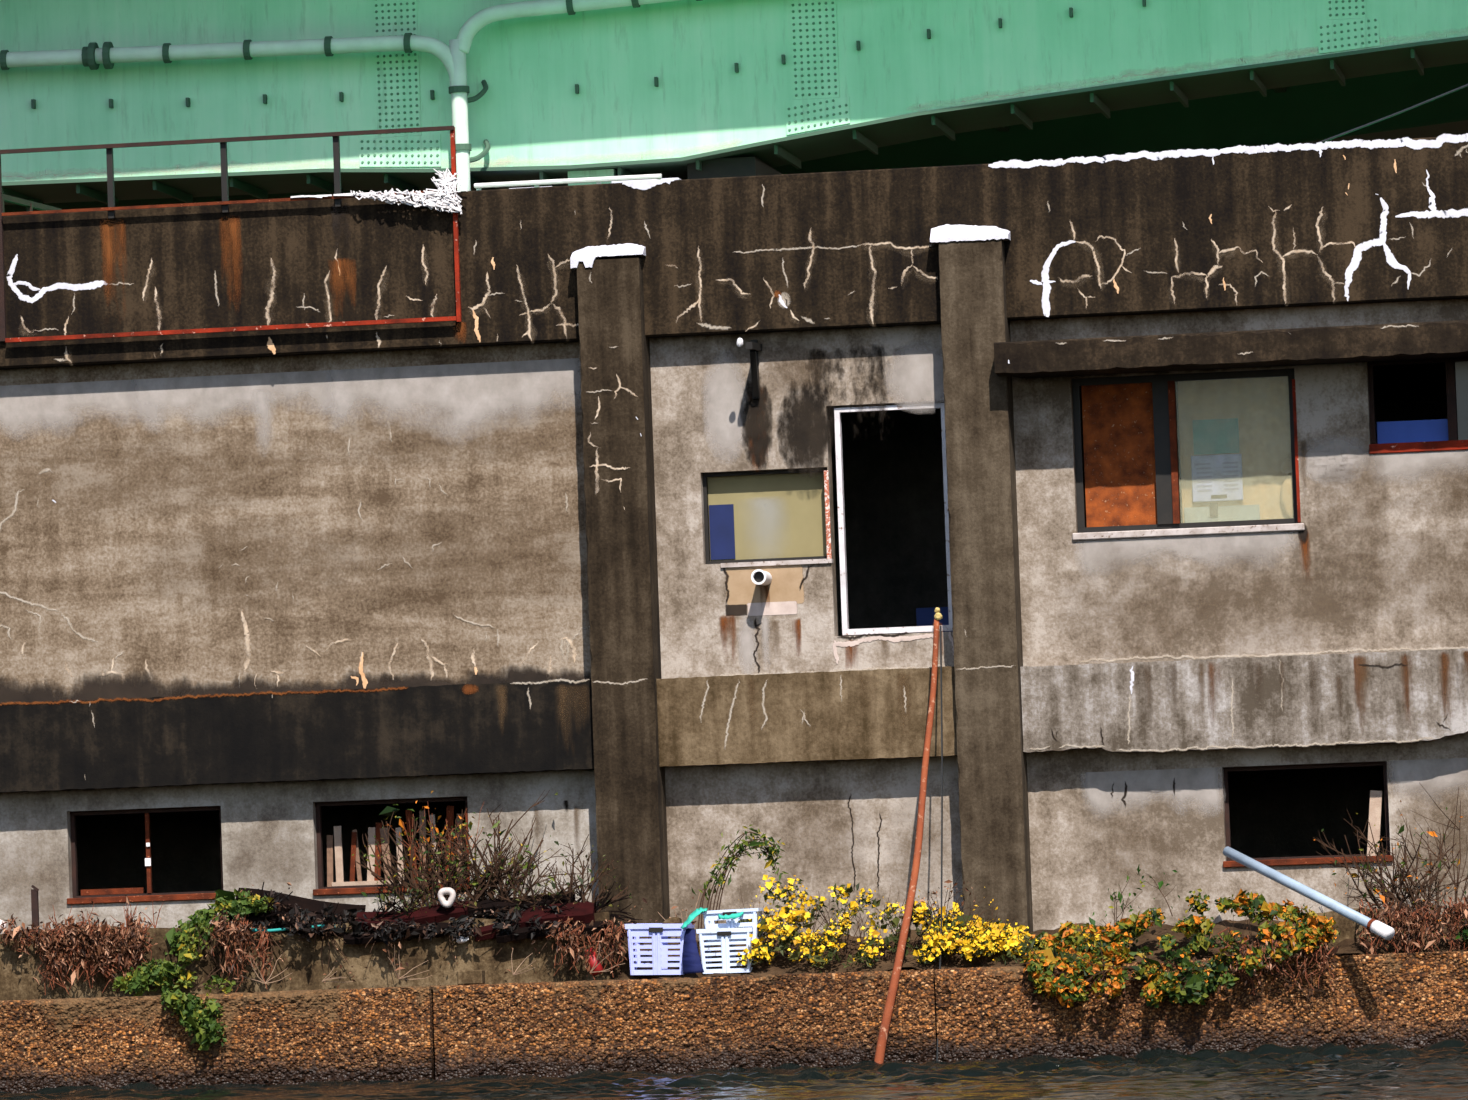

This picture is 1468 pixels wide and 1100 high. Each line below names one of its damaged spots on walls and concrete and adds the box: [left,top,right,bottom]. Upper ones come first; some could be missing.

crack [7,254,163,361]
rust [102,221,124,286]
rust [223,217,240,287]
rust [333,259,353,289]
crack [676,231,938,330]
crack [1030,169,1468,317]